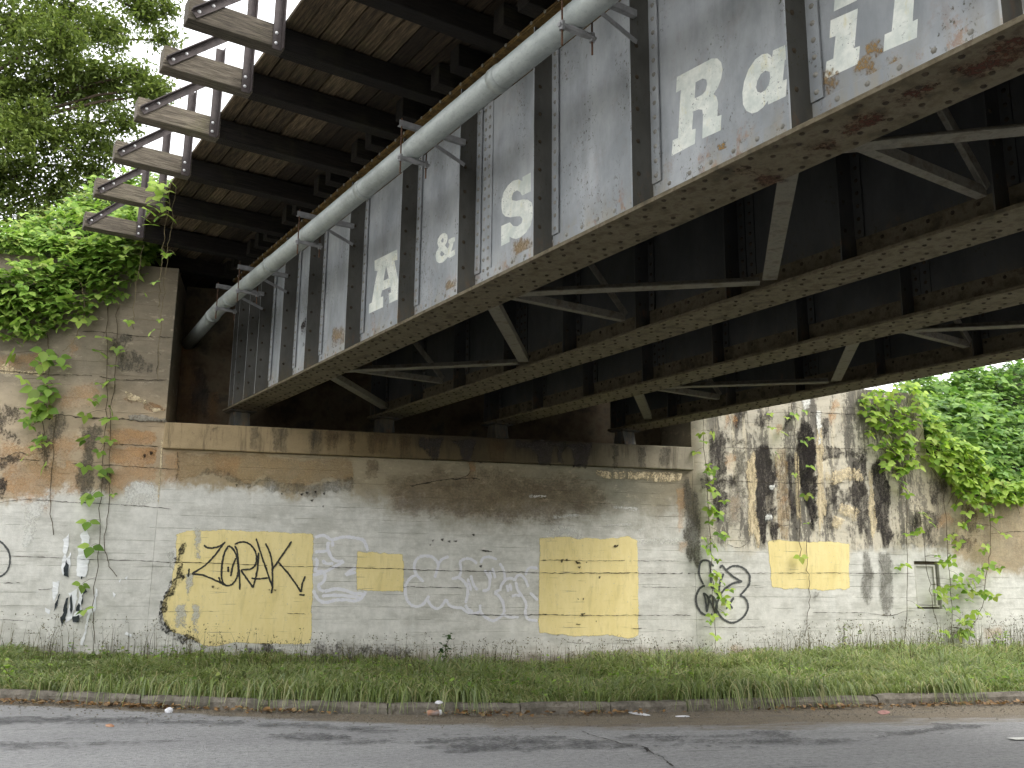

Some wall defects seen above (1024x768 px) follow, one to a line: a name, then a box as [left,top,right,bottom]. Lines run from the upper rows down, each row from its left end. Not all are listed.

corrosion [855,40,883,74]
corrosion [514,238,532,255]
damp [0,405,26,499]
damp [75,425,111,496]
damp [125,440,163,505]
damp [683,400,895,612]
damp [912,479,947,546]
damp [175,604,199,633]